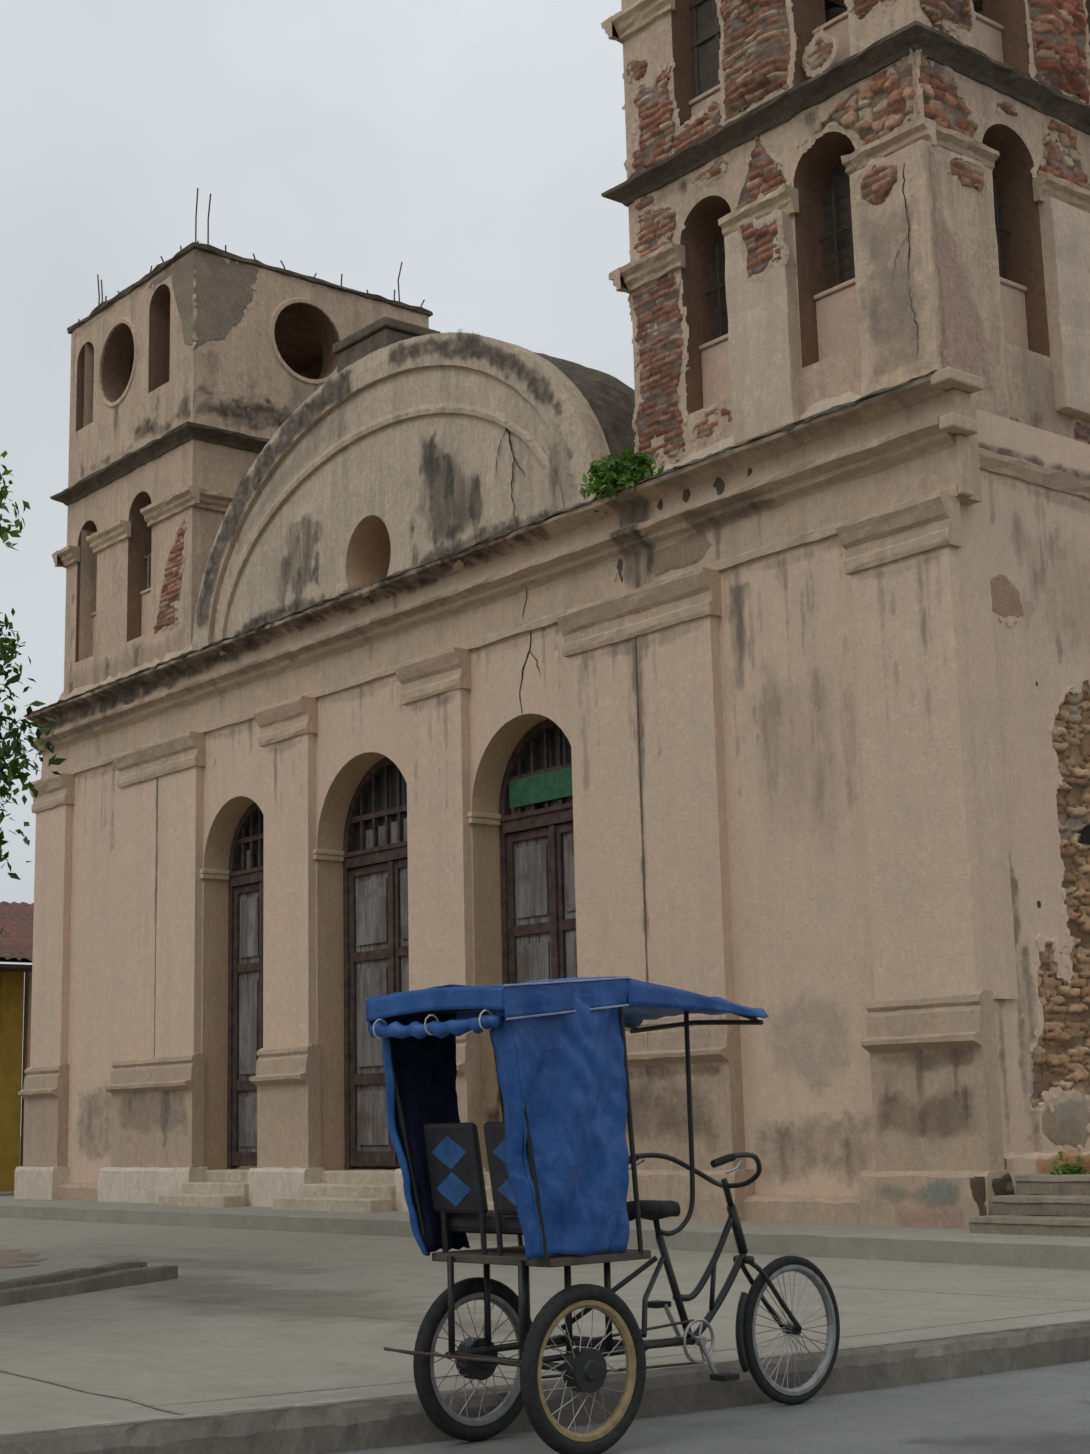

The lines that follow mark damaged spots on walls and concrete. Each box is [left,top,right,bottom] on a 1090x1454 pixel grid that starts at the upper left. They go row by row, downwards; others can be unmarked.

spalling [629,187,685,260]
spalling [622,0,838,180]
spalling [690,48,1022,283]
crack [891,164,918,361]
spalling [1024,0,1090,105]
spalling [1031,116,1090,190]
spalling [628,271,733,466]
crack [495,428,525,518]
spalling [152,509,188,637]
leakage [28,436,549,734]
crack [519,589,540,713]
spalling [1025,665,1090,1151]